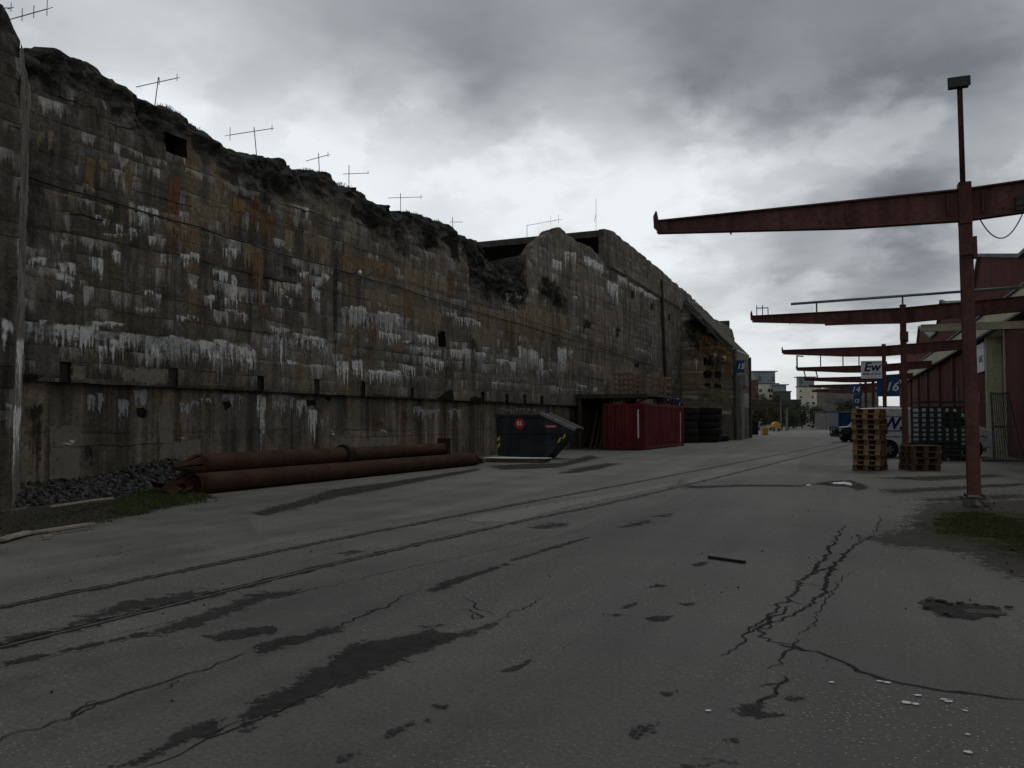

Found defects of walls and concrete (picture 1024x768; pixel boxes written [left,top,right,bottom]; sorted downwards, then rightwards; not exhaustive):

water stain [55,262,87,300]
water stain [92,250,120,279]
water stain [96,202,160,245]
water stain [207,269,246,322]
water stain [264,266,576,388]
water stain [553,251,656,307]
water stain [2,320,256,470]
water stain [257,393,335,441]
crack [721,494,1024,703]
crack [0,653,243,741]
crack [144,682,336,767]
water stain [0,589,499,768]